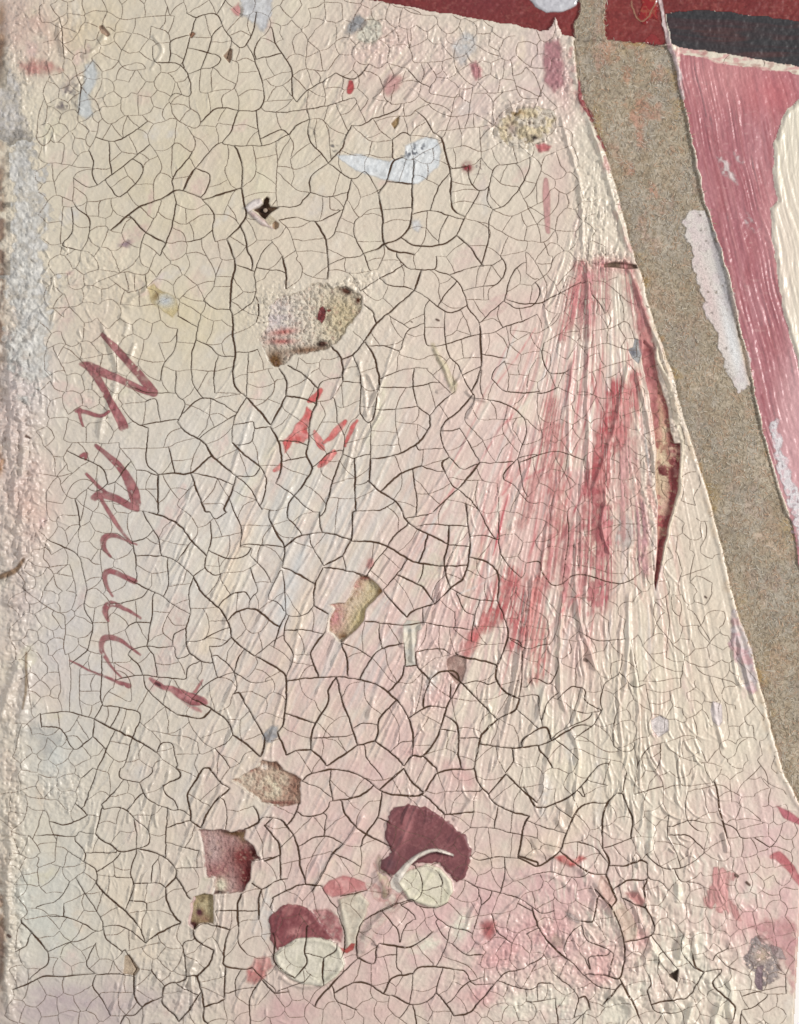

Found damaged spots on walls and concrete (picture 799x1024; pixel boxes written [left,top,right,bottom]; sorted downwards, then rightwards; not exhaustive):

crack [77,77,135,124]
crack [152,1,330,179]
crack [307,64,369,100]
peeling [258,283,362,367]
crack [13,97,696,1024]
peeling [327,576,382,642]
peeling [231,760,301,807]
crack [667,806,704,856]
crack [677,771,780,847]
peeling [189,829,260,928]
crack [647,936,787,1024]